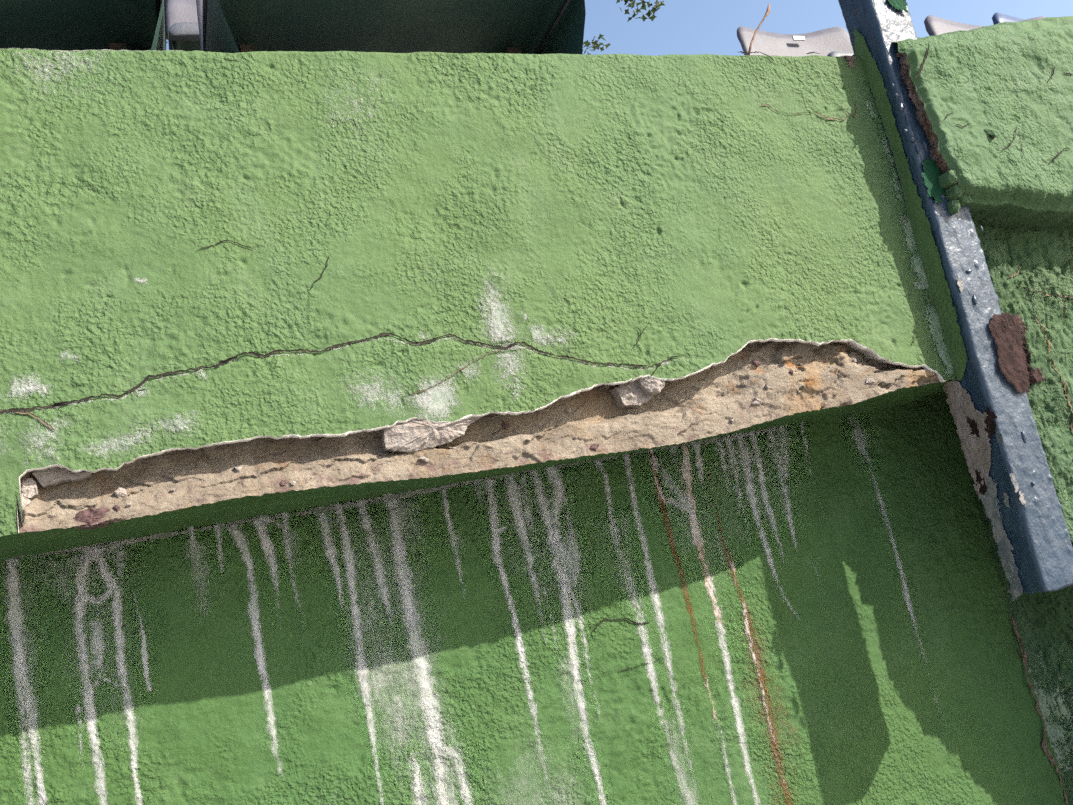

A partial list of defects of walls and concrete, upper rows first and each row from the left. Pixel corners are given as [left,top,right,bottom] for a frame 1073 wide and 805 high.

water stain [84,414,190,455]
crack [0,322,700,430]
efflorescence [351,376,460,419]
efflorescence [479,274,523,397]
spalling [16,87,1026,601]
efflorescence [524,314,572,345]
corrosion [989,313,1045,395]
water stain [6,423,807,805]
corrosion [648,449,716,718]
corrosion [719,525,792,805]
water stain [877,493,916,627]